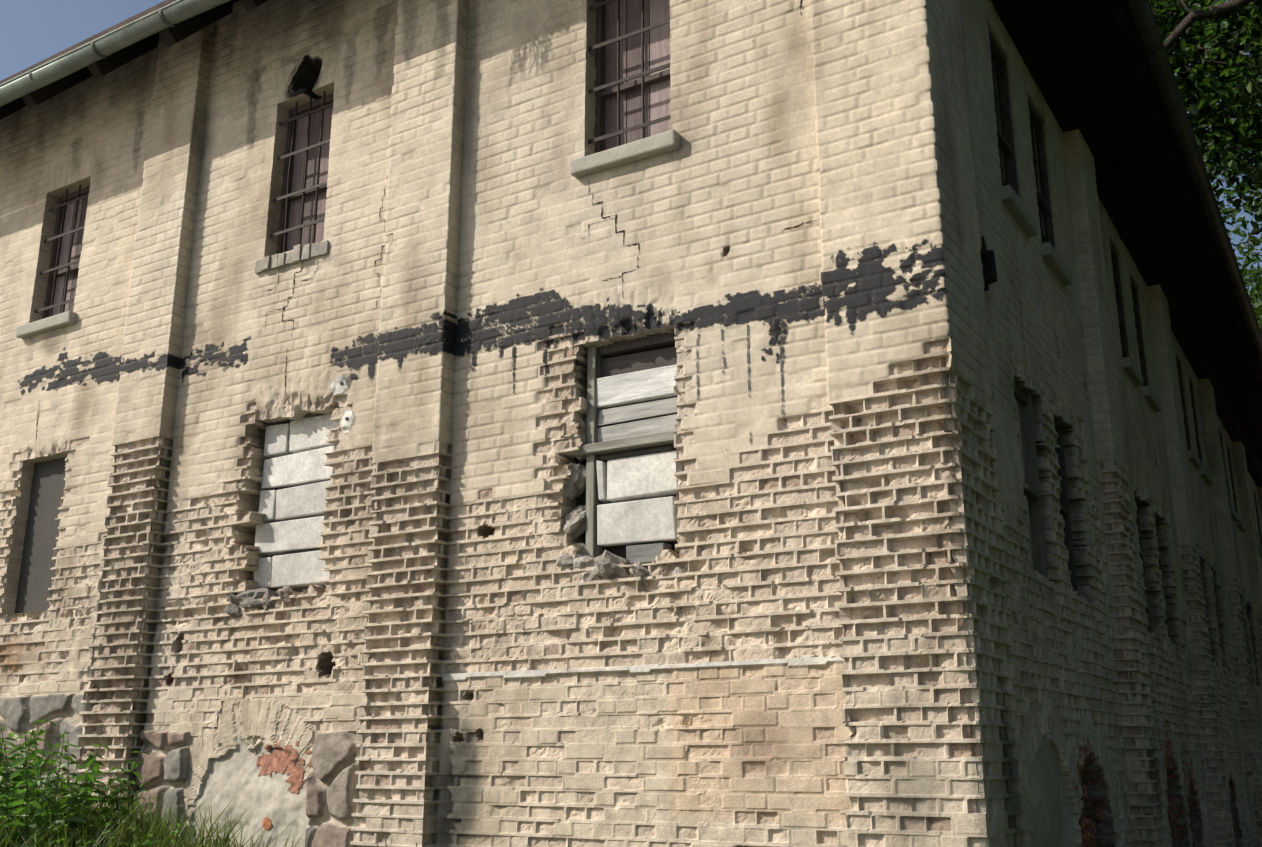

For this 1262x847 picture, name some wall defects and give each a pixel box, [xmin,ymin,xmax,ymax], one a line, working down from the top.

crack [373,188,393,309]
crack [581,182,639,299]
spalling [0,305,1262,847]